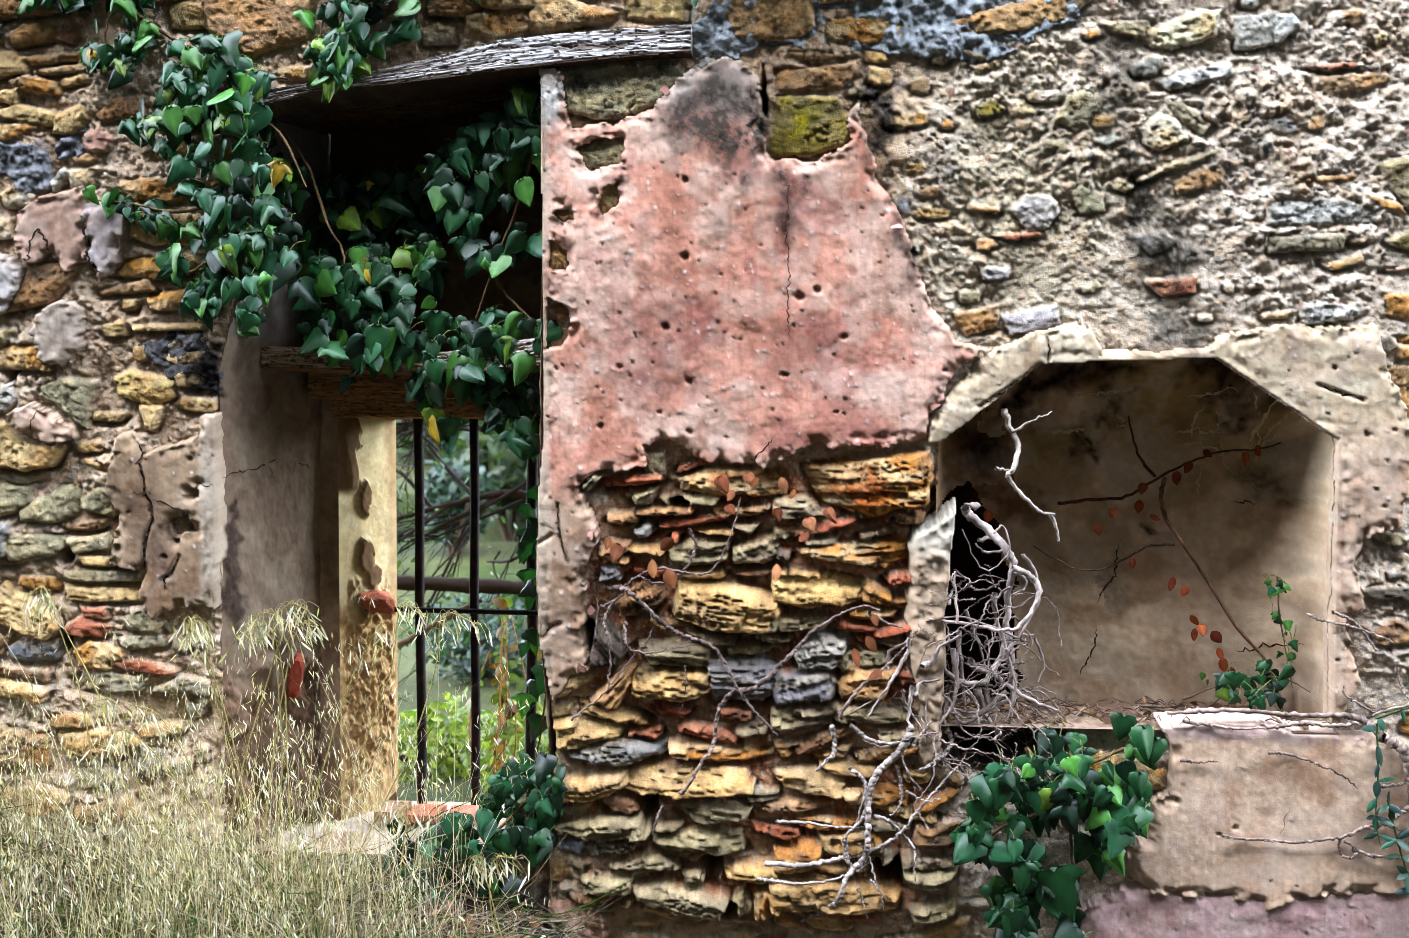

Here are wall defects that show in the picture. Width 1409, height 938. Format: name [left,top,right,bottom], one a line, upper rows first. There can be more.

damp [661,69,768,185]
crack [783,185,791,340]
damp [772,168,811,246]
crack [129,445,312,589]
peeling [536,56,1409,938]